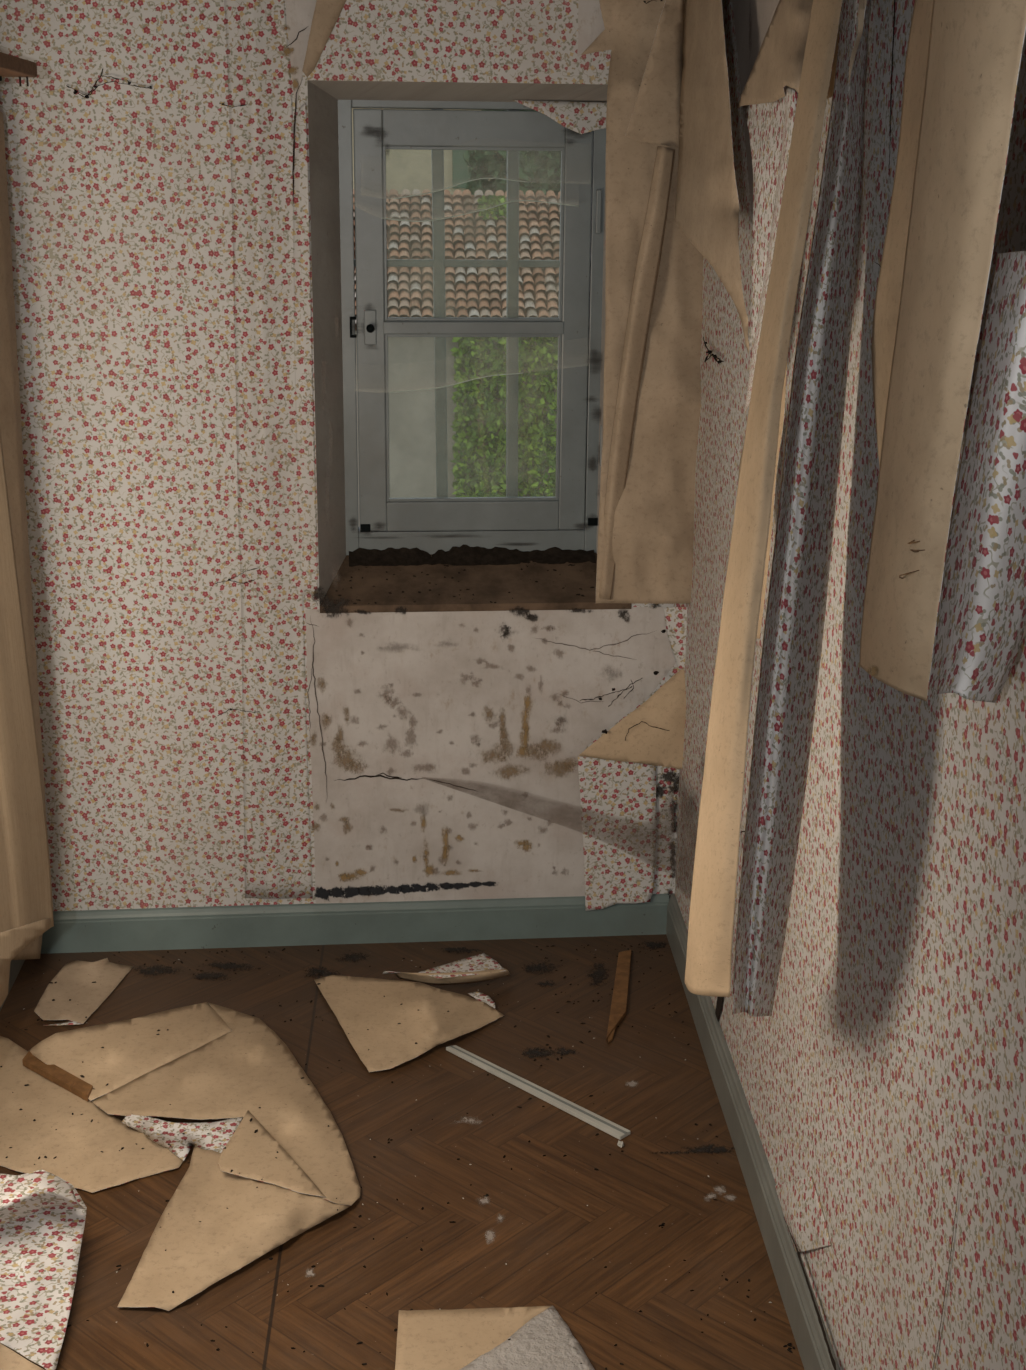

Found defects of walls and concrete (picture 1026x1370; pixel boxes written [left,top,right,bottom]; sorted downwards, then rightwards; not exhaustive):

peeling [285,0,346,125]
peeling [732,0,780,224]
leakage [311,709,361,772]
peeling [305,607,686,904]
leakage [483,709,578,779]
leakage [314,881,499,901]